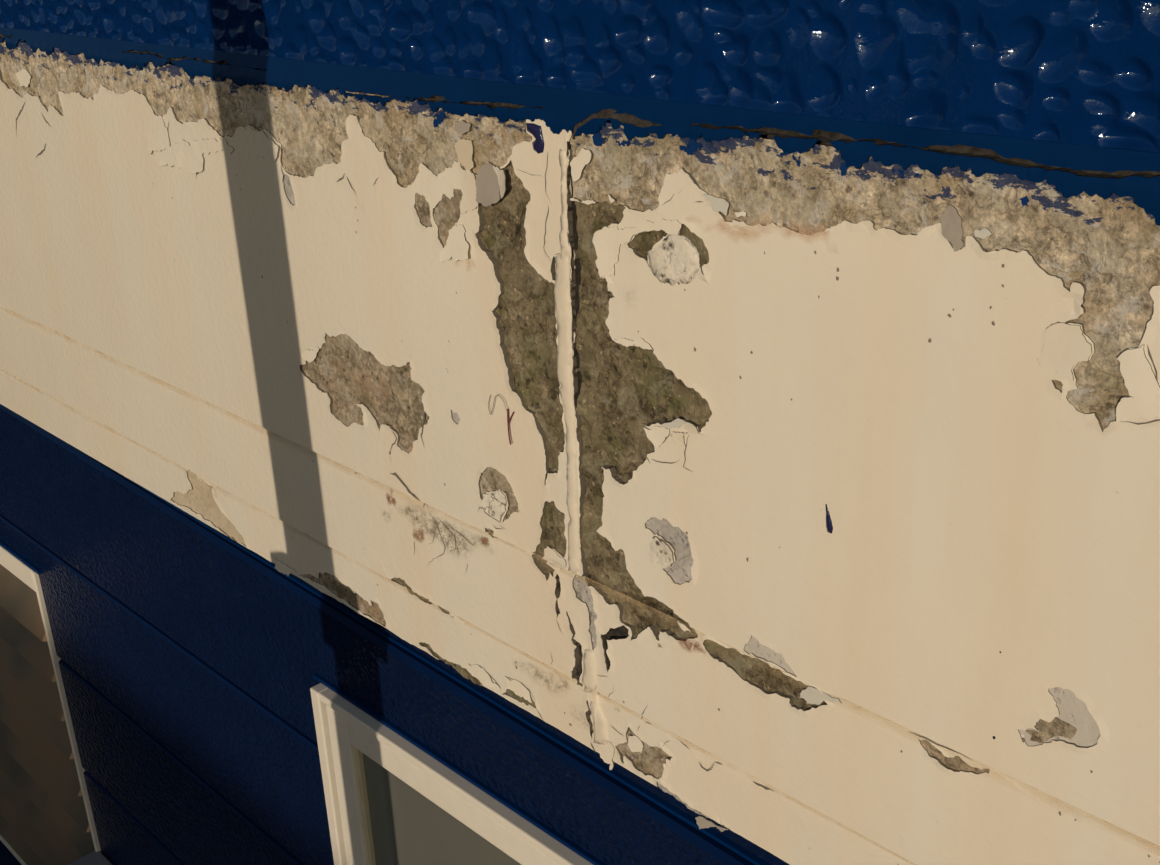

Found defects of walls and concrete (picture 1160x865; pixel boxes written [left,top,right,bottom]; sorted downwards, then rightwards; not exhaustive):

peeling [0,41,1160,709]
peeling [593,728,728,832]
peeling [921,740,990,774]
peeling [1019,687,1100,747]